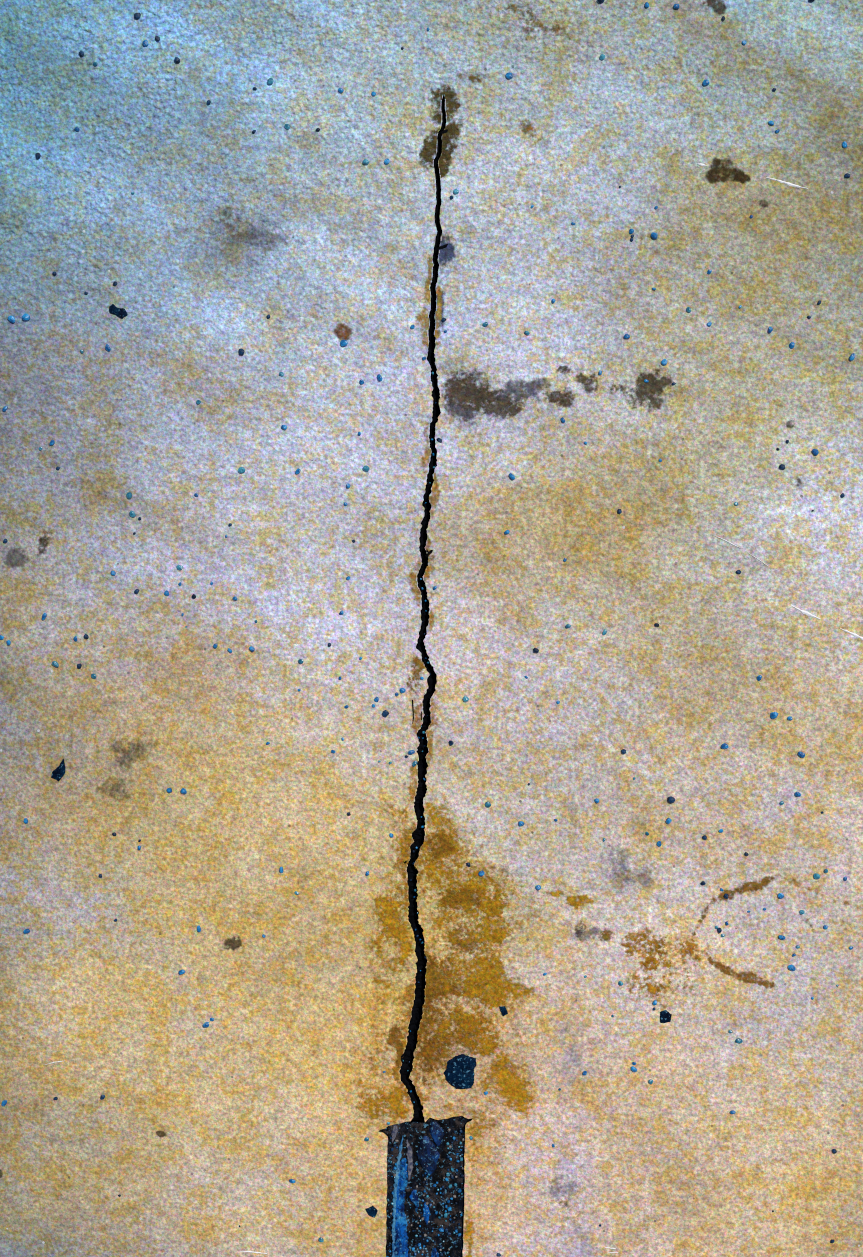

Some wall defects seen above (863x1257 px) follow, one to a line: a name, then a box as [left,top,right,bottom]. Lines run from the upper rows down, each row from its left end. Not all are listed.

crack [399,95,448,1122]
water stain [448,366,672,421]